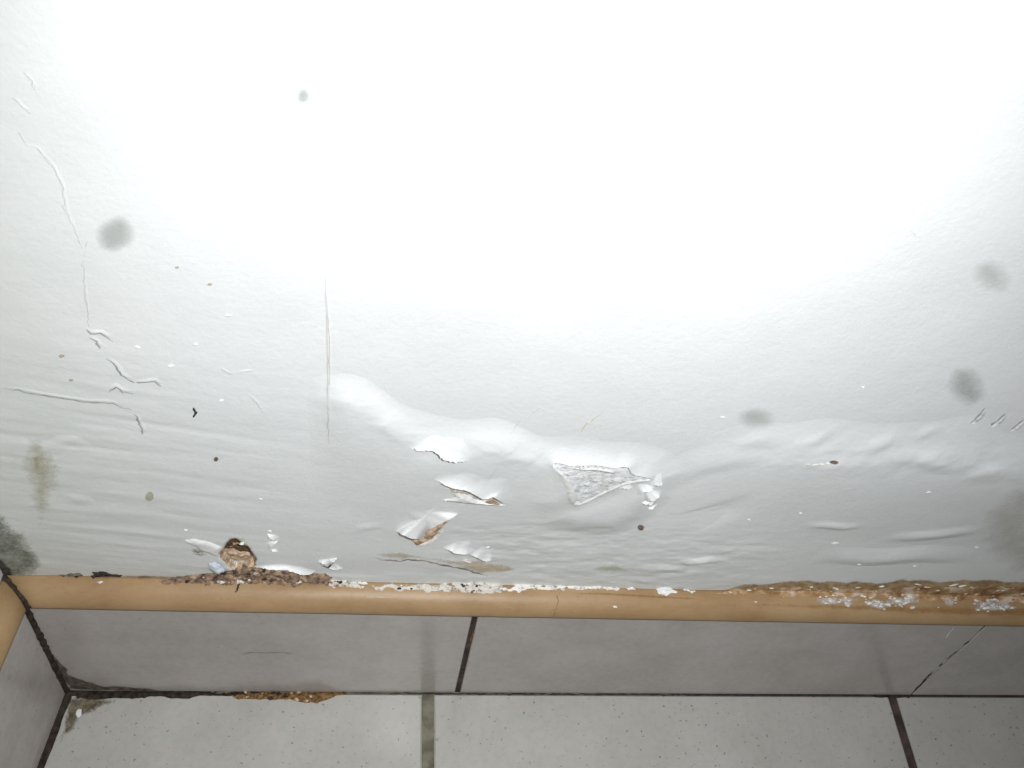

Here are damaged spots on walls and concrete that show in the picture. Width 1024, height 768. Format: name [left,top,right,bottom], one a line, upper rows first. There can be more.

crack [3,73,162,434]
crack [324,277,332,442]
leakage [0,519,36,575]
flaking render [151,529,635,594]
peeling [396,435,516,562]
peeling [540,447,663,511]